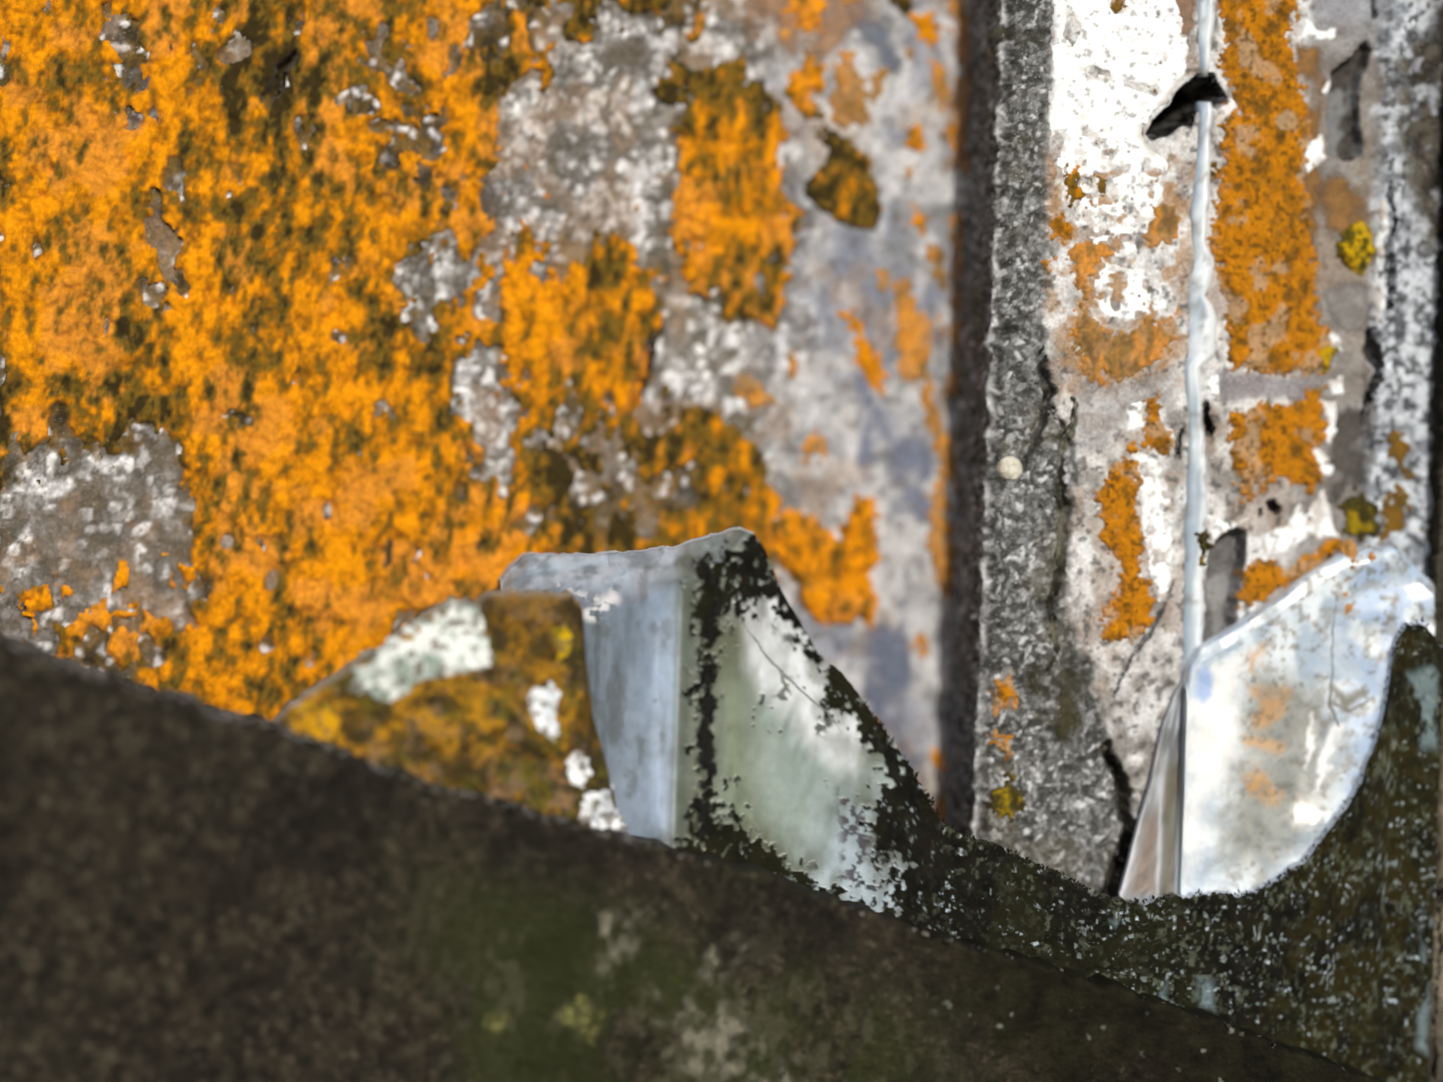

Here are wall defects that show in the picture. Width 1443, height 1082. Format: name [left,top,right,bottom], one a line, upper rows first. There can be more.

peeling [1299,19,1336,40]
peeling [1195,97,1237,125]
spalling [1304,39,1373,173]
crack [1112,588,1170,698]
crack [1097,738,1137,898]